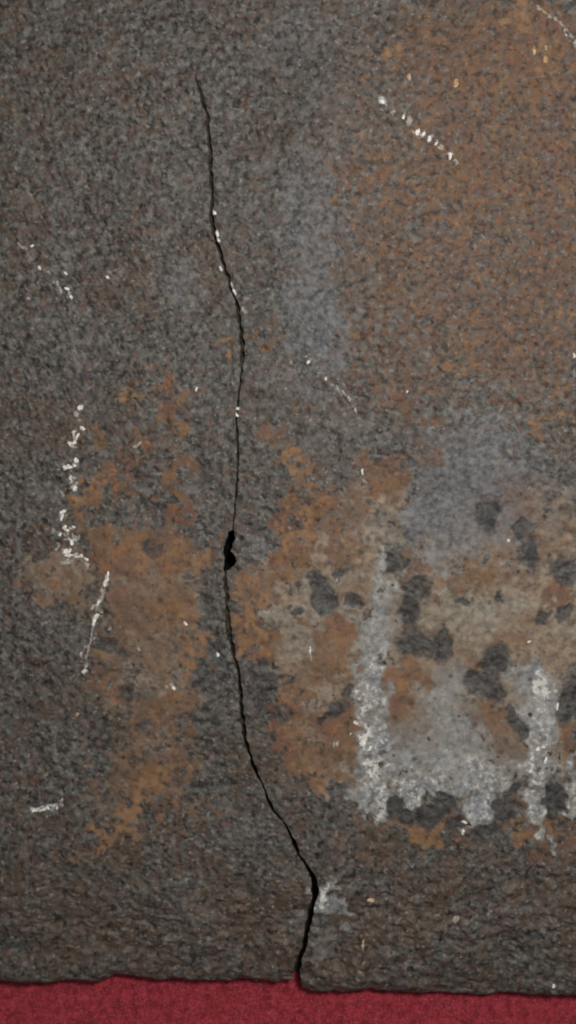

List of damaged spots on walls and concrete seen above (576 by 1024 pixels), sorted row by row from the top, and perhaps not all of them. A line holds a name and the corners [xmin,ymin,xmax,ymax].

rust [11,367,240,880]
leakage [137,243,216,338]
crack [195,72,319,974]
leakage [249,0,370,419]
rust [264,612,490,897]
rust [228,0,576,660]
leakage [235,397,576,857]
rust [460,698,528,765]
rust [503,794,576,884]